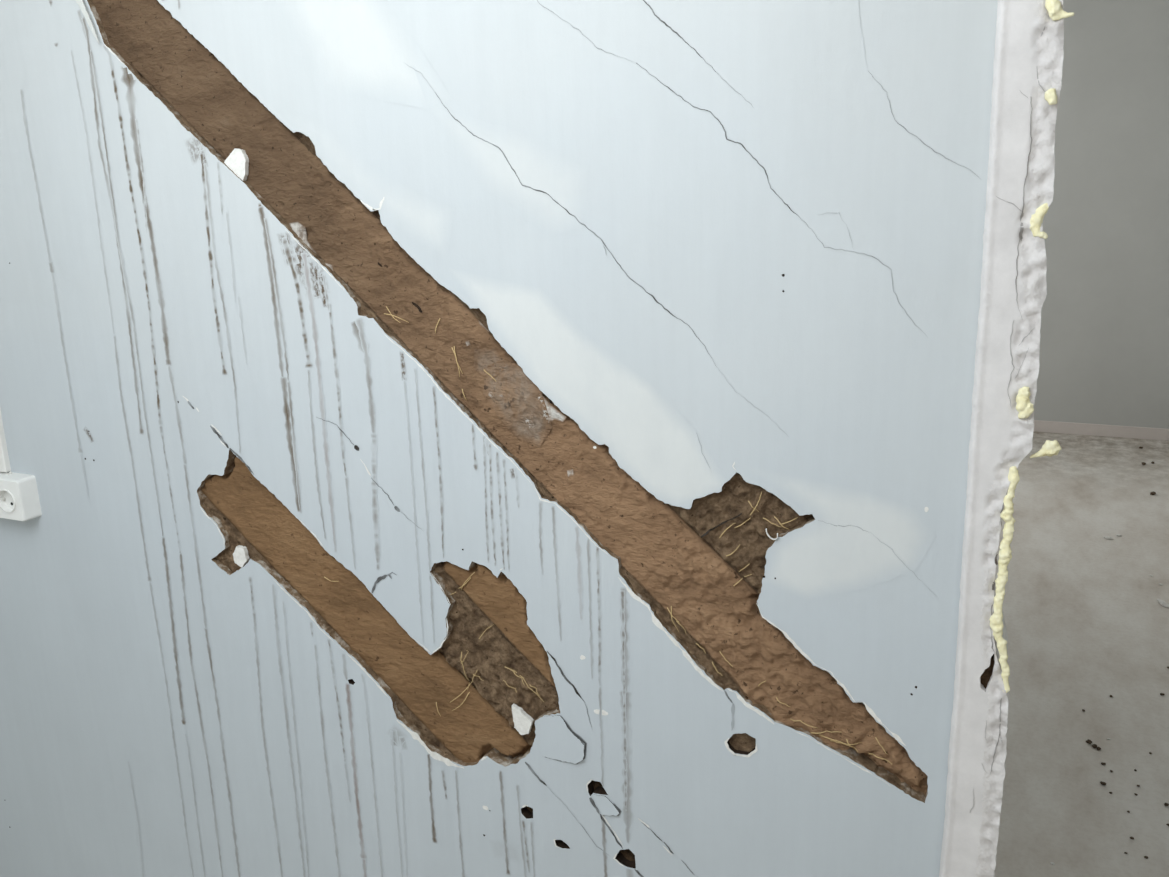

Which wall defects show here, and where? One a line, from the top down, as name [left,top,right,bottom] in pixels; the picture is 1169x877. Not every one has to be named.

water stain [53,9,247,877]
water stain [257,203,356,570]
water stain [350,318,381,570]
spalling [76,0,928,795]
crack [405,63,788,436]
crack [537,0,926,335]
crack [858,0,1044,406]
water stain [309,621,383,877]
peeling [586,779,622,817]
crack [525,762,698,877]
spalling [613,849,635,867]
spalling [981,654,995,688]